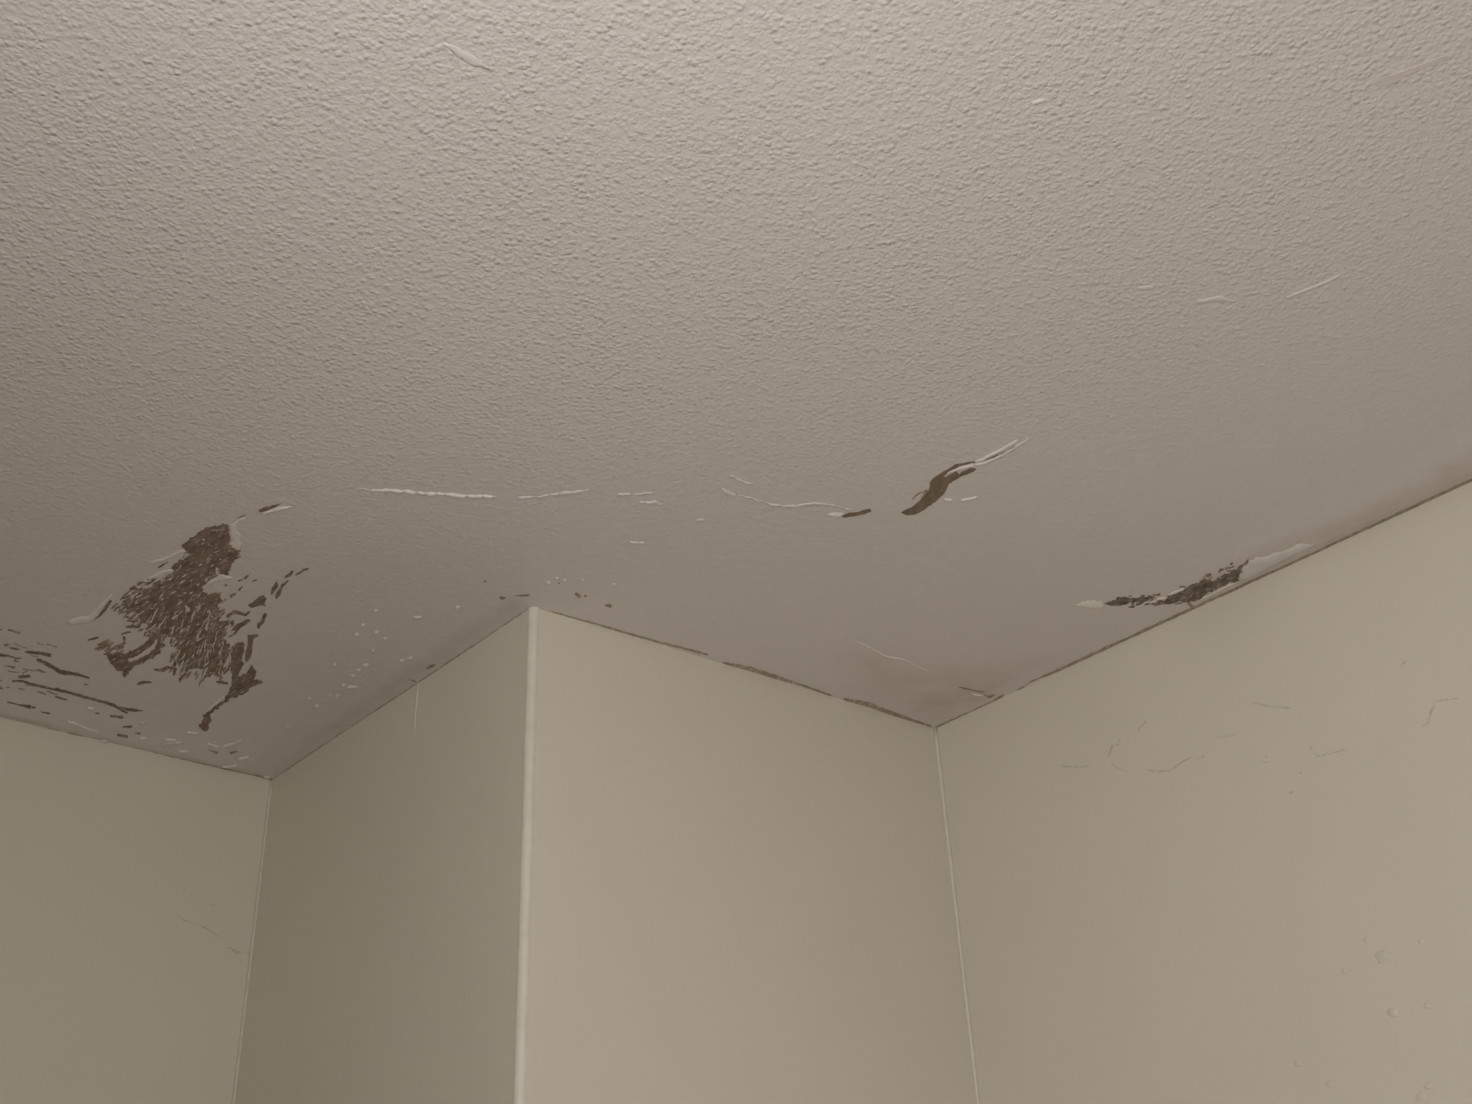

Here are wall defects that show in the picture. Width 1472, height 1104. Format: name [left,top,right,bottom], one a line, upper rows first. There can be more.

crack [826,438,1029,518]
peeling [0,629,143,737]
peeling [68,503,309,731]
crack [135,478,1472,780]